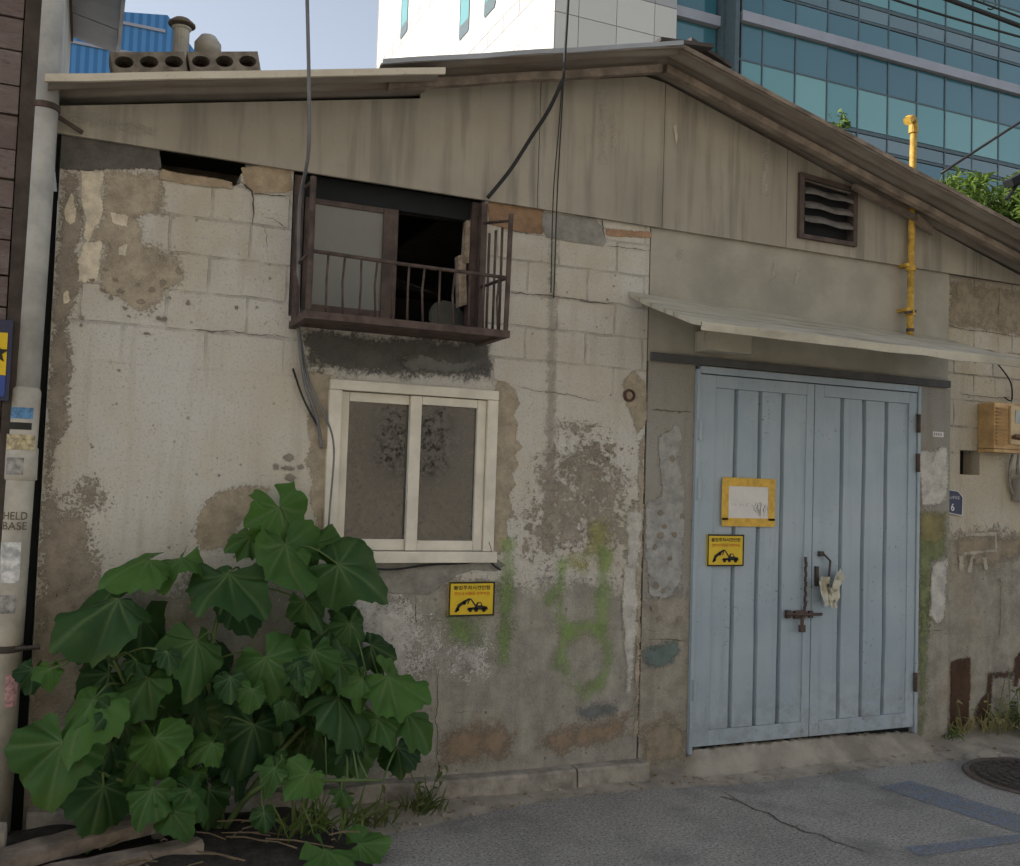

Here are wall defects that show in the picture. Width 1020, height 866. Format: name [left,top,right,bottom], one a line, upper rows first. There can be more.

spalling [241,164,293,194]
water stain [301,329,493,383]
peeling [29,135,233,723]
peeling [194,482,271,552]
peeling [500,409,686,600]
peeling [920,446,950,506]
peeling [929,559,948,623]
rust [950,653,1020,733]